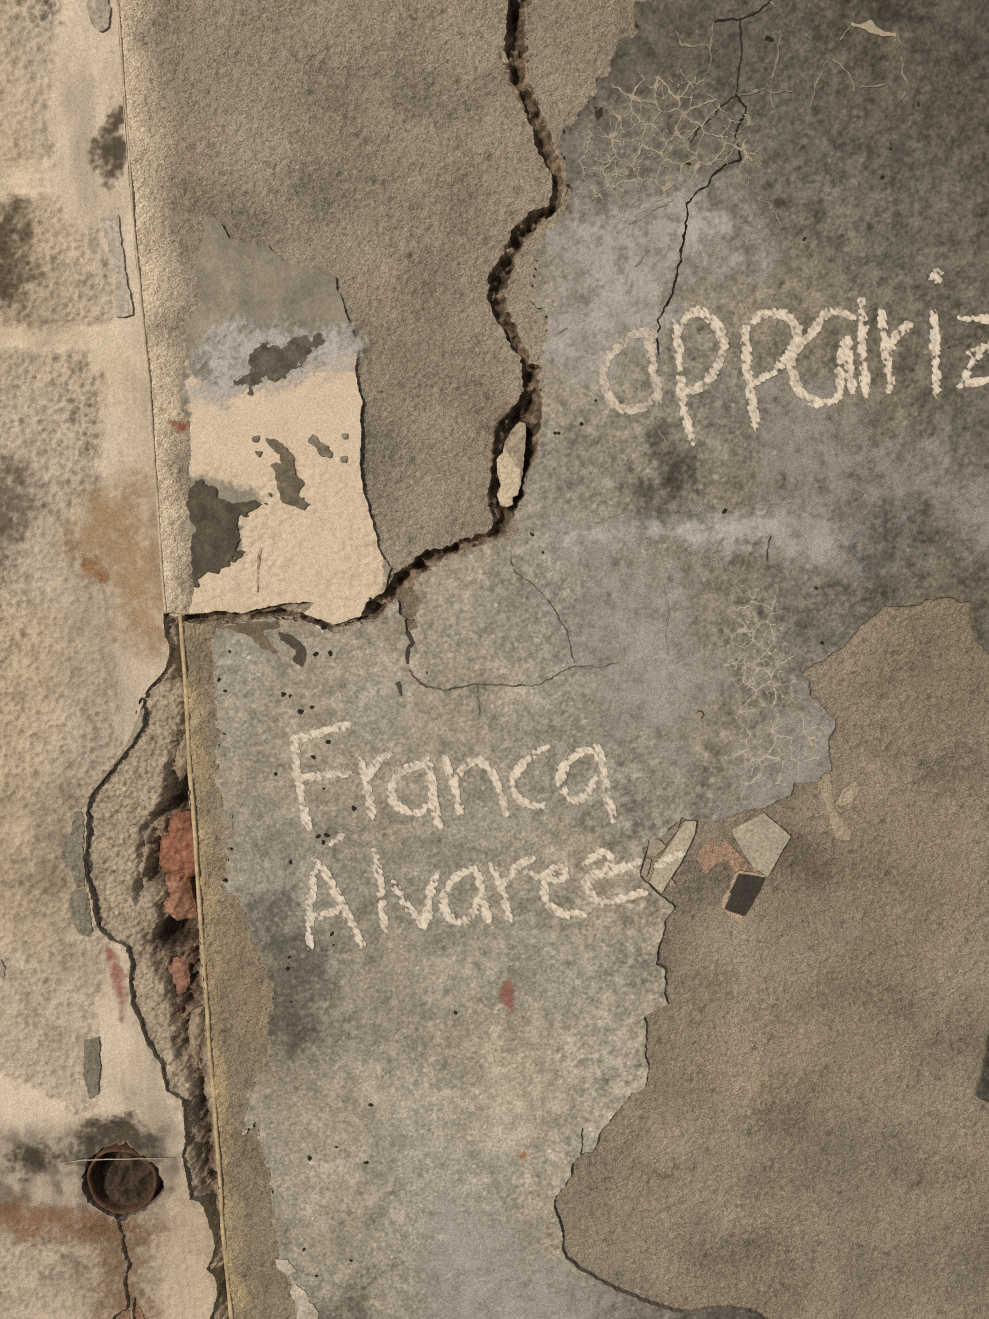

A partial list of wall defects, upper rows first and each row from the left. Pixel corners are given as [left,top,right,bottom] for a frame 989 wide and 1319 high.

flaking render [83,1036,102,1099]
flaking render [60,707,147,937]
crack [112,1221,135,1319]
peeling [87,0,659,1319]
crack [166,0,908,715]
peeling [554,597,989,1319]